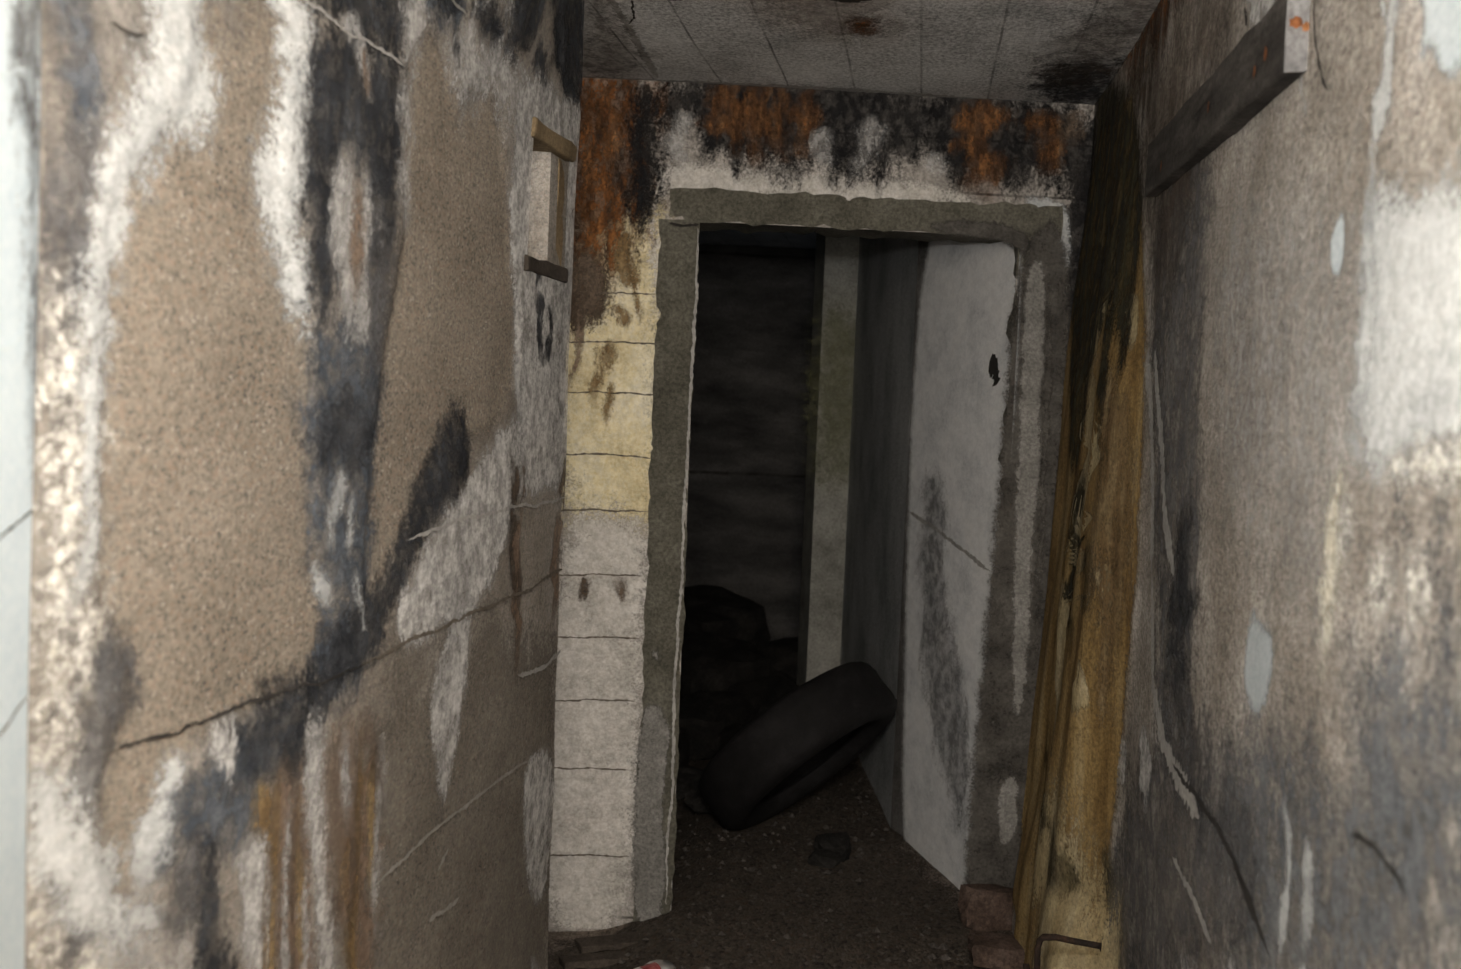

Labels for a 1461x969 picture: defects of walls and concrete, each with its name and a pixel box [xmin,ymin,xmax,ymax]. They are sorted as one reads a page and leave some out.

crack [606,0,659,78]
rust [949,101,1085,188]
leakage [250,0,653,543]
rust [568,78,672,419]
crack [108,569,640,753]
leakage [509,456,526,613]
crack [407,497,646,541]
crack [566,222,699,903]
leakage [920,0,1461,969]
crack [1142,345,1269,955]
crack [550,852,629,860]
crack [554,765,633,773]